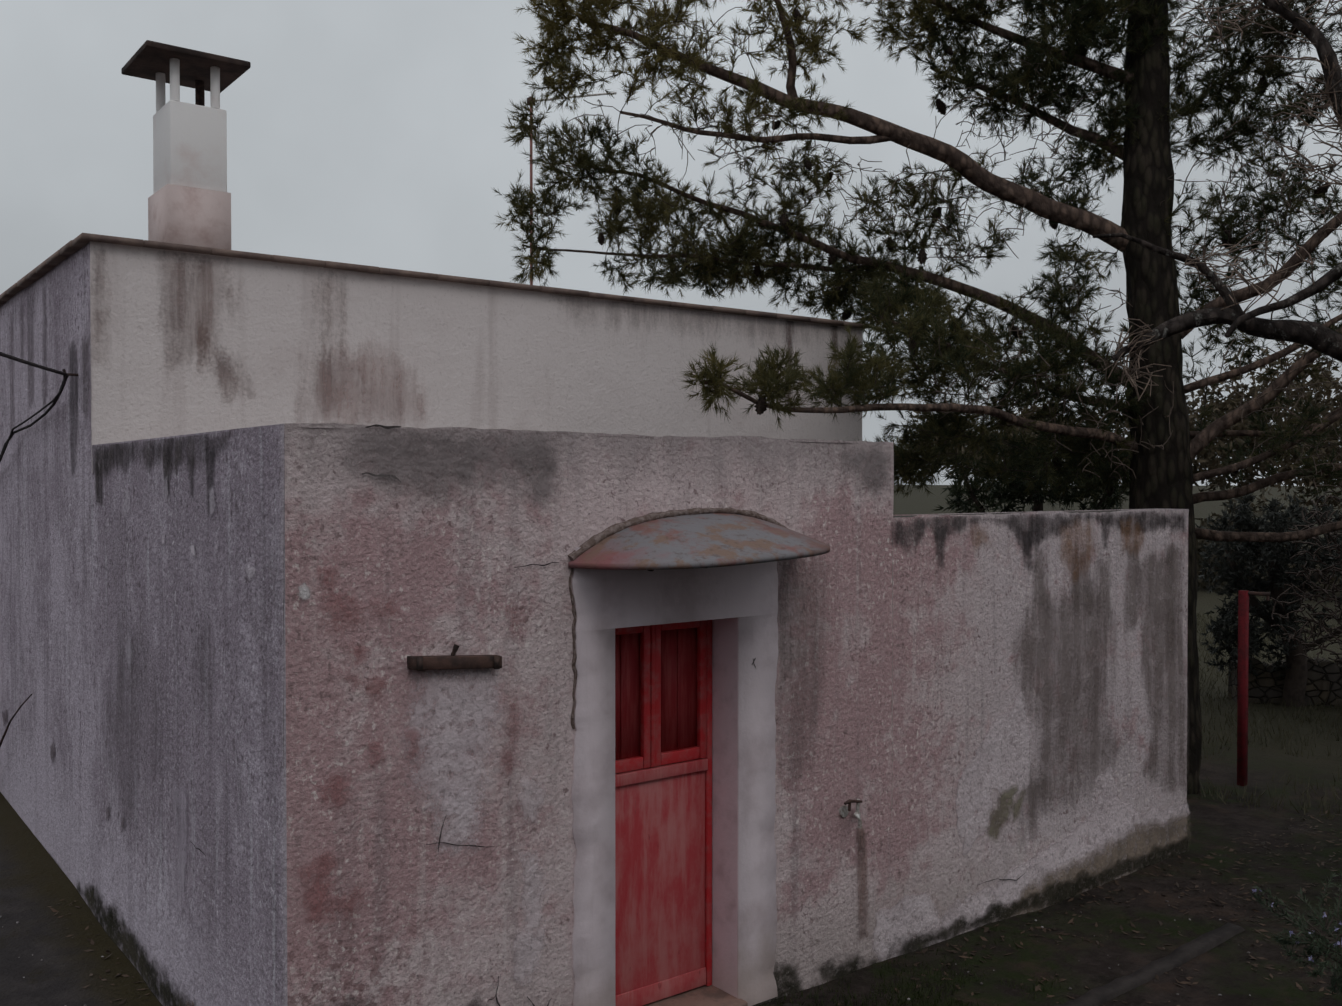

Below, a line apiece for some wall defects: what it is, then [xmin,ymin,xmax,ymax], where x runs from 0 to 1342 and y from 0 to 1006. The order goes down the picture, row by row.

damp [70,344,87,472]
damp [93,436,224,505]
damp [895,516,978,564]
damp [989,512,1185,838]
damp [77,883,185,1006]